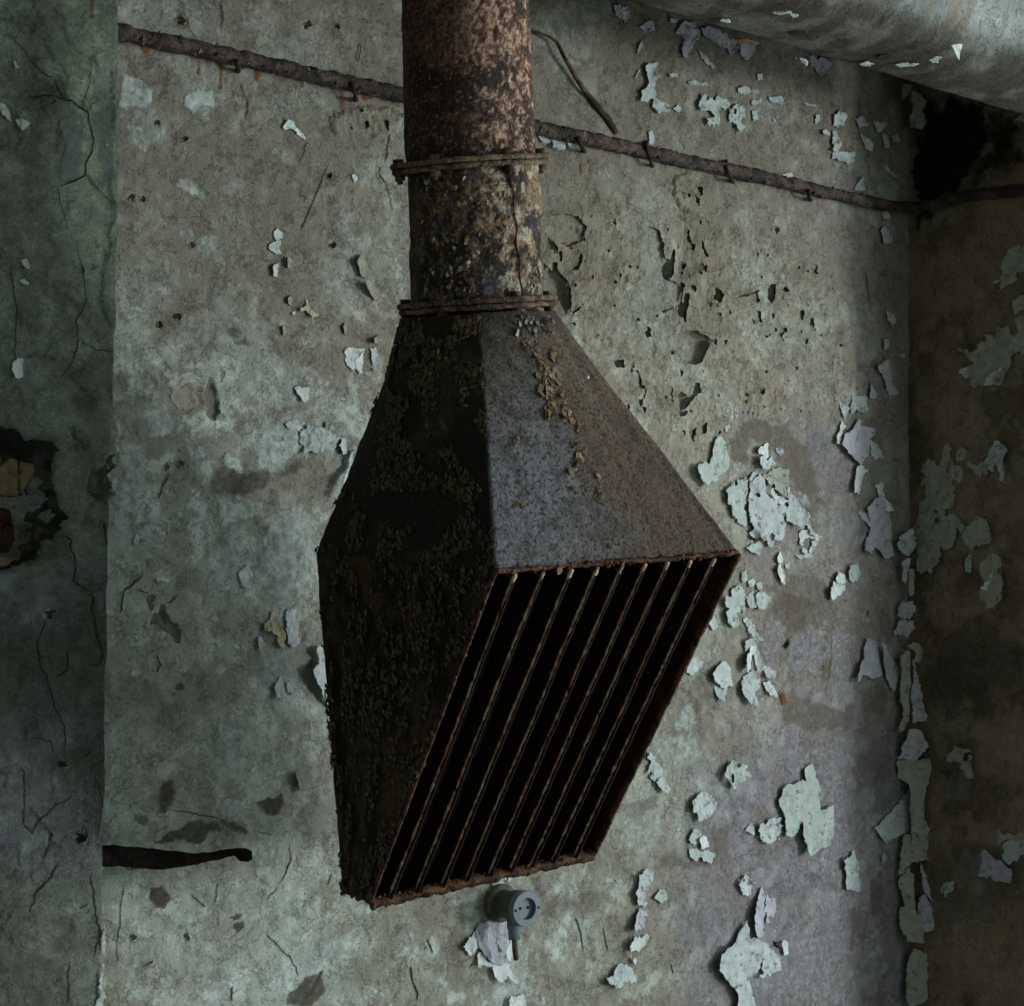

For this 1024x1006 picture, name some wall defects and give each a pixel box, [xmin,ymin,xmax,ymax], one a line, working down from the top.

crack [8,33,114,377]
peeling [635,61,784,134]
leakage [911,97,1023,231]
peeling [836,308,905,494]
crack [97,522,107,546]
peeling [282,313,495,905]
peeling [697,402,822,585]
crack [21,535,104,911]
peeling [745,764,834,856]
peeling [830,439,1008,1006]
crack [66,874,125,1005]
peeling [463,919,526,1006]